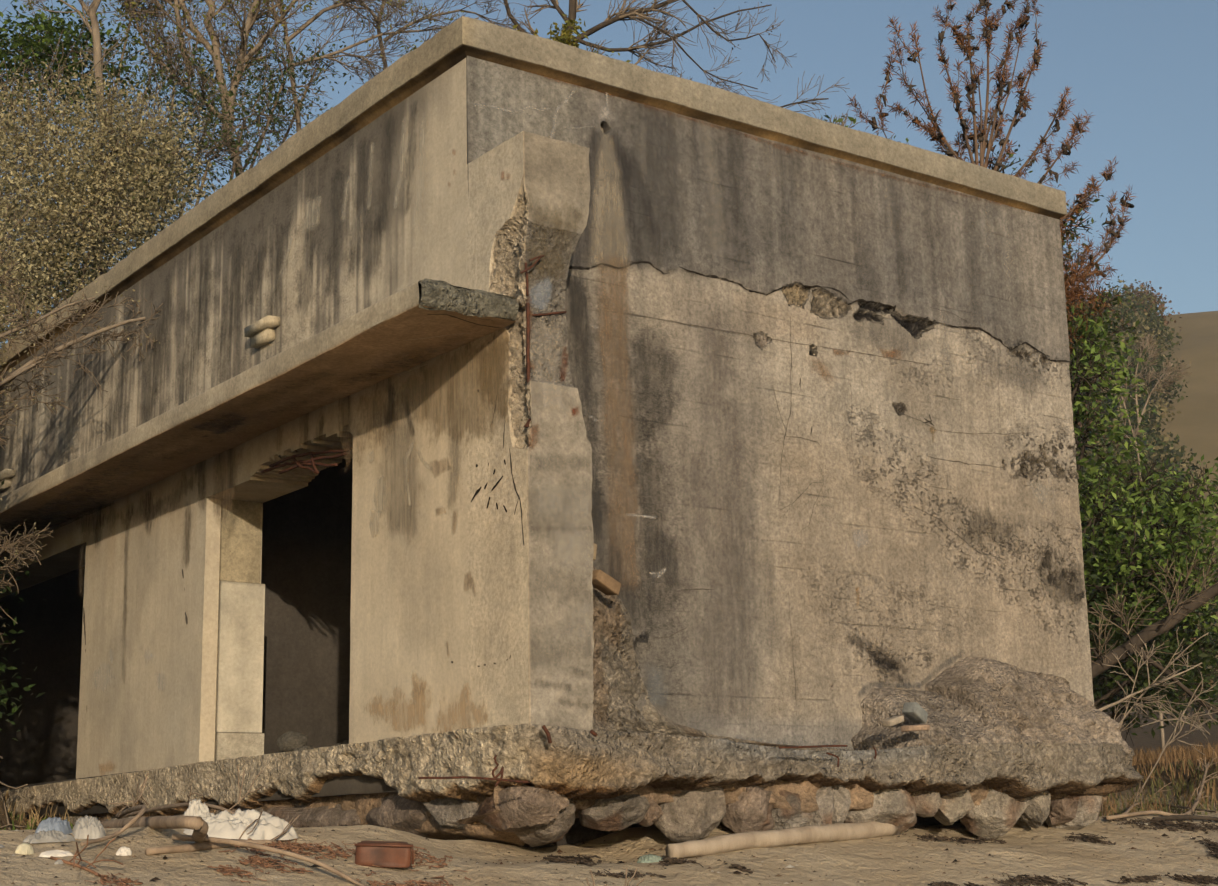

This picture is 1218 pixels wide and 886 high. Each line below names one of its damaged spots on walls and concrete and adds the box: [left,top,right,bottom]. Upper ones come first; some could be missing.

crack [569,261,896,311]
spalling [525,262,566,383]
crack [928,307,1071,362]
water stain [569,135,677,619]
water stain [373,339,508,532]
spalling [261,449,350,474]
spalling [633,631,649,650]
spalling [418,754,530,787]
spalling [779,745,847,767]